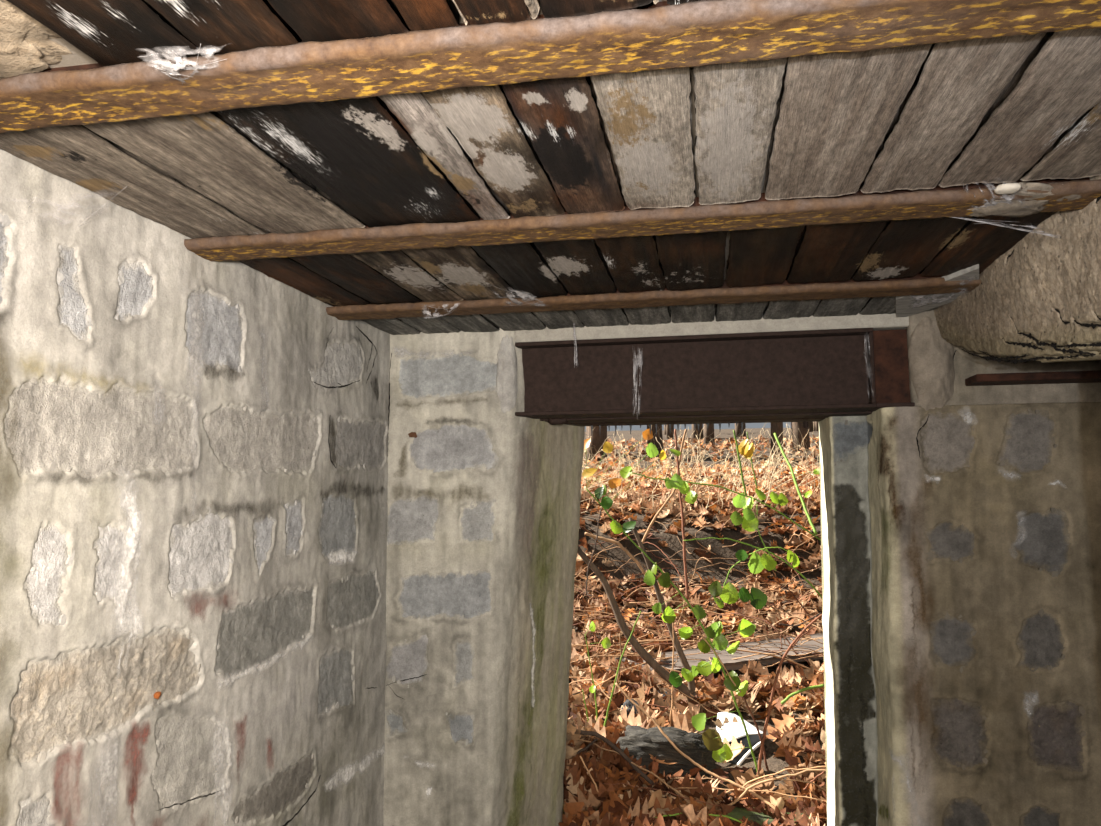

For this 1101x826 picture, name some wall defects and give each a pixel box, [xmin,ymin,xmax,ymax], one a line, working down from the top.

spalling [0,214,14,304]
crack [953,309,1101,364]
crack [283,775,321,826]